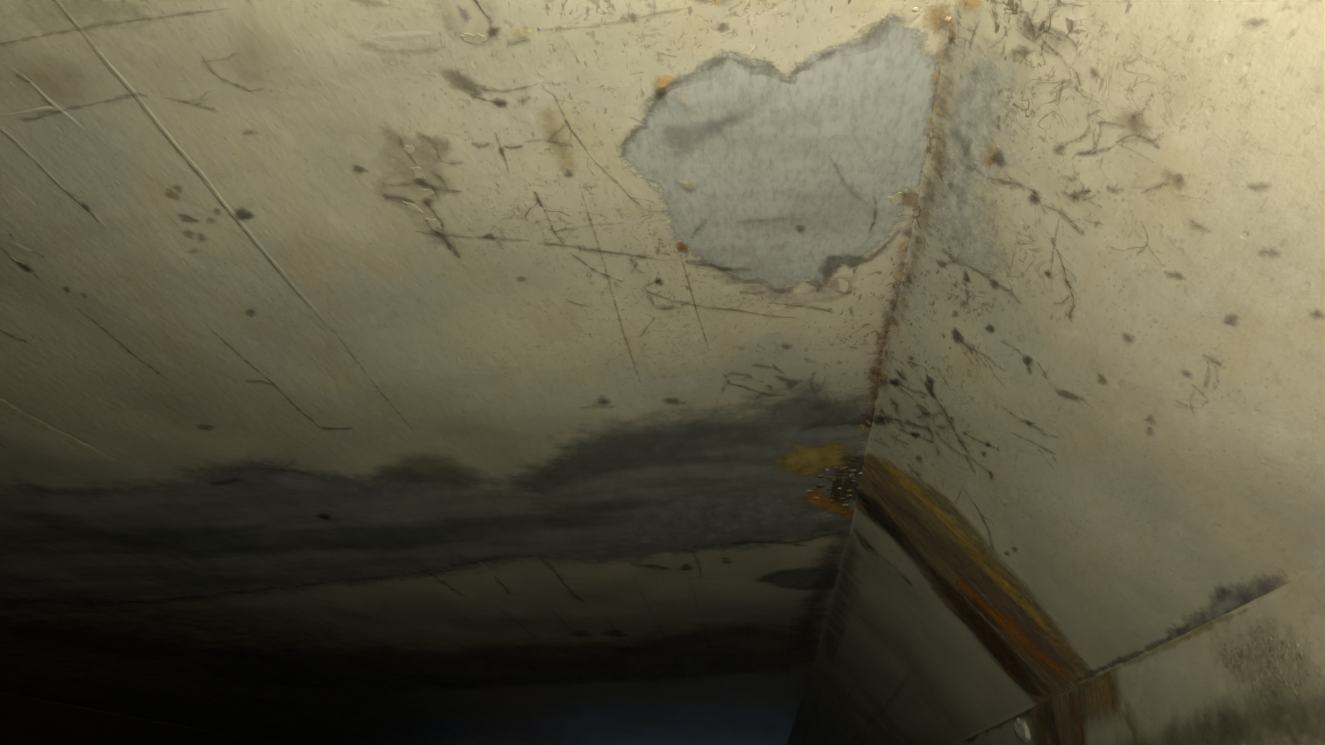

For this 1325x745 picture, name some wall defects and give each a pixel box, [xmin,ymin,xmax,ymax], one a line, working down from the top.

spalling [603,0,944,298]
corrosion [987,143,1004,165]
damp [0,389,868,604]
corrosion [776,443,1118,745]